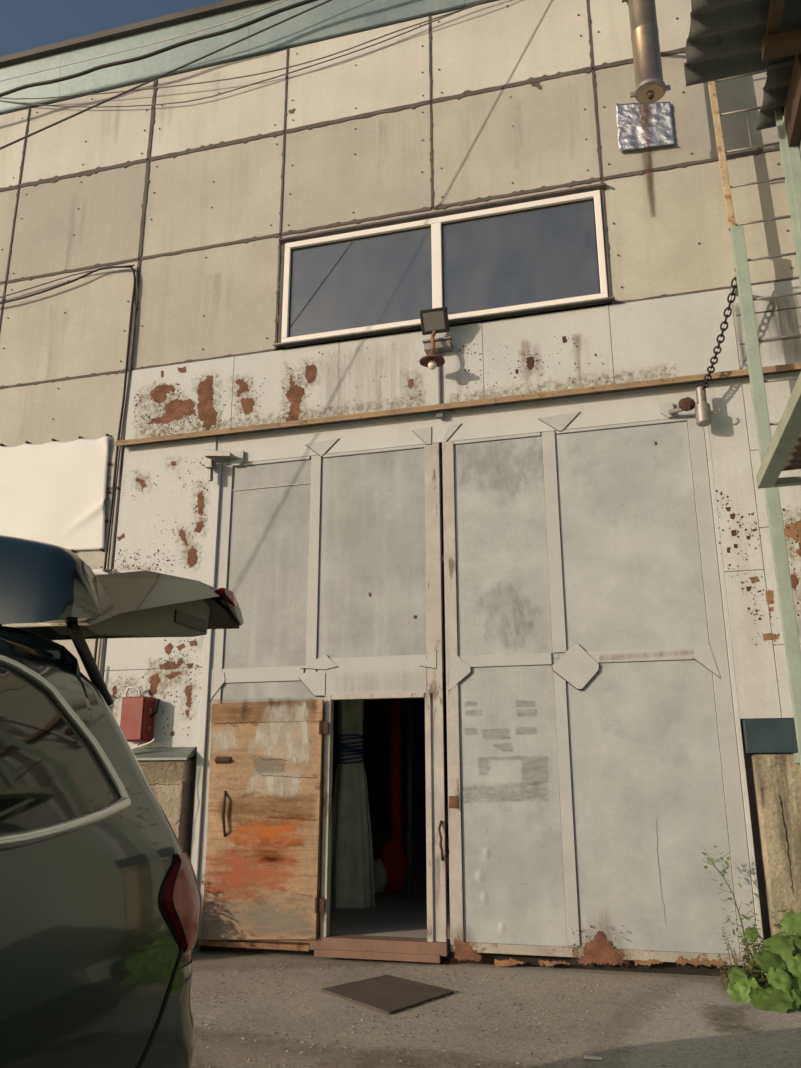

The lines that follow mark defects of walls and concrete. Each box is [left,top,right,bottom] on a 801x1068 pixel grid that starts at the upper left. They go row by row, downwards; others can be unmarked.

crack [140,762,187,840]
corrosion [454,939,481,962]
corrosion [494,925,726,968]